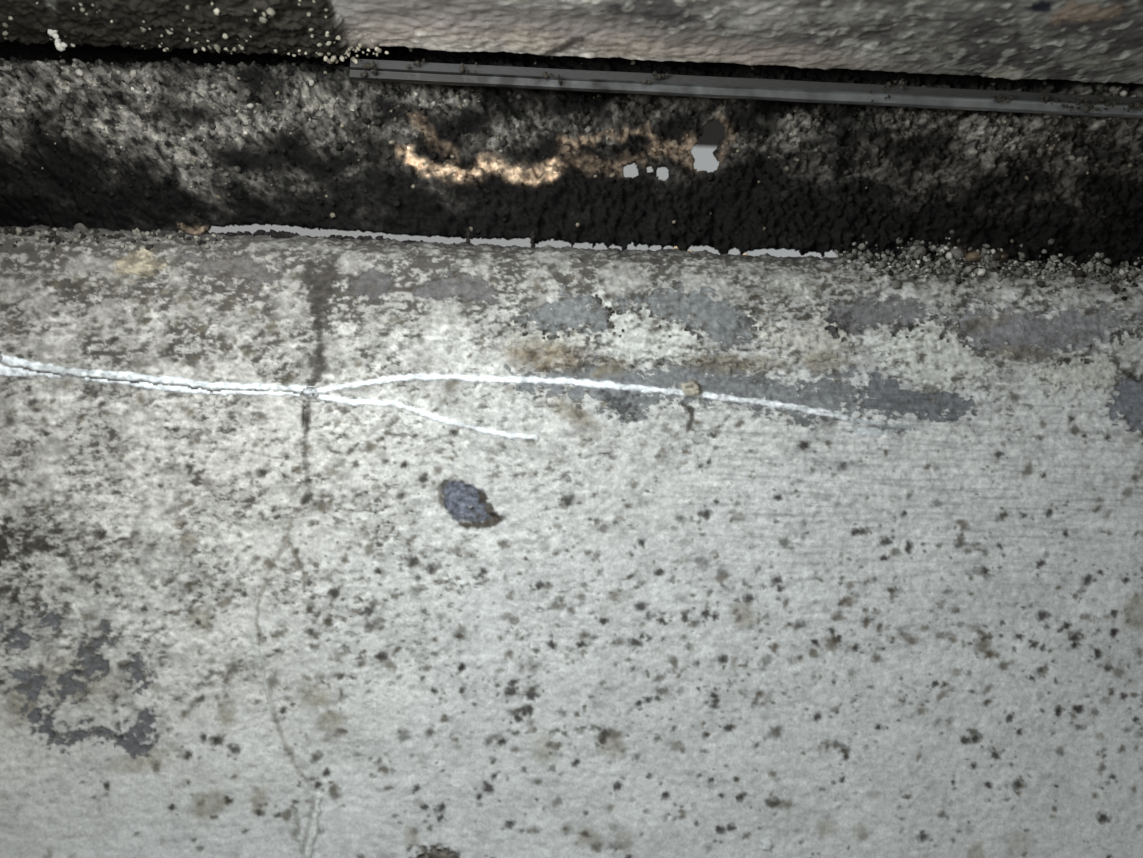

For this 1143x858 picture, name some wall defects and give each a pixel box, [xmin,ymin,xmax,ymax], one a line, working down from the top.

leakage [412,31,684,62]
crack [0,260,910,440]
crack [305,795,321,858]